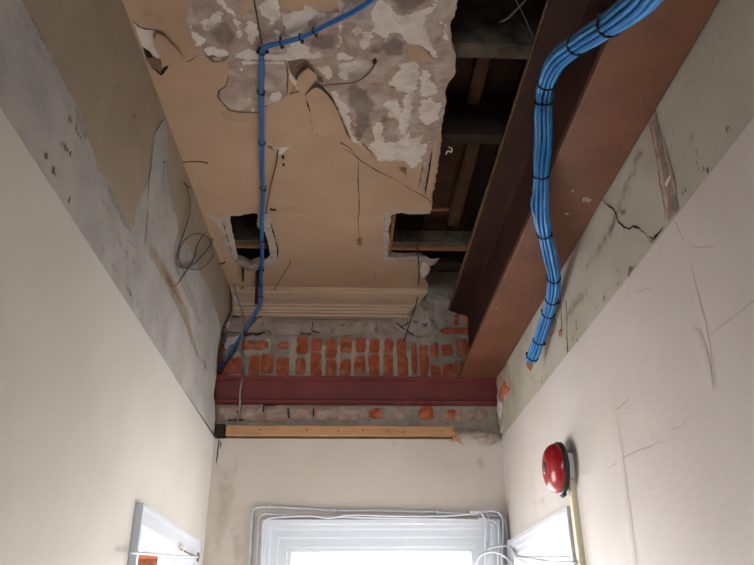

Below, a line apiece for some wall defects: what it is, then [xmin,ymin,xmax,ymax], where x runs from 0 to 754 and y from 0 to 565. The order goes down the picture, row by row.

peeling [0,0,457,435]
crack [340,142,431,241]
crack [603,201,713,253]
crack [692,269,754,388]
flaking render [456,364,514,445]